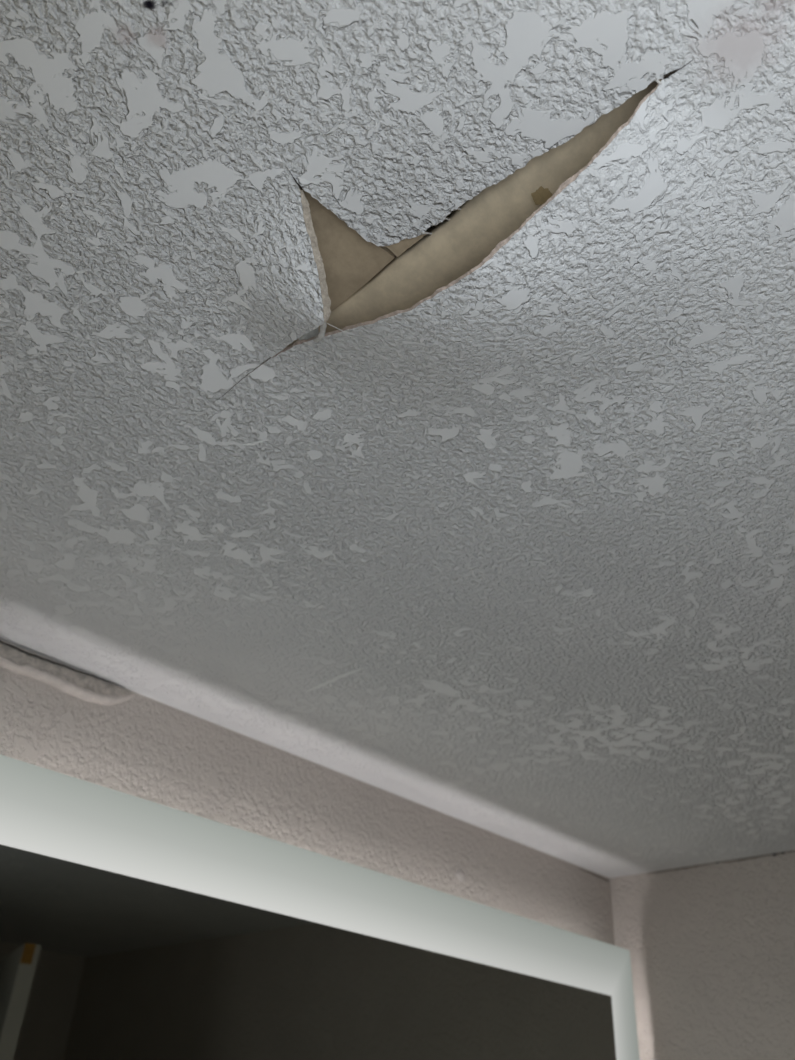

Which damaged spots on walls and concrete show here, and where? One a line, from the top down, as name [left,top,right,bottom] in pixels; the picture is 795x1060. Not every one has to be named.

crack [664,61,691,79]
crack [213,357,271,403]